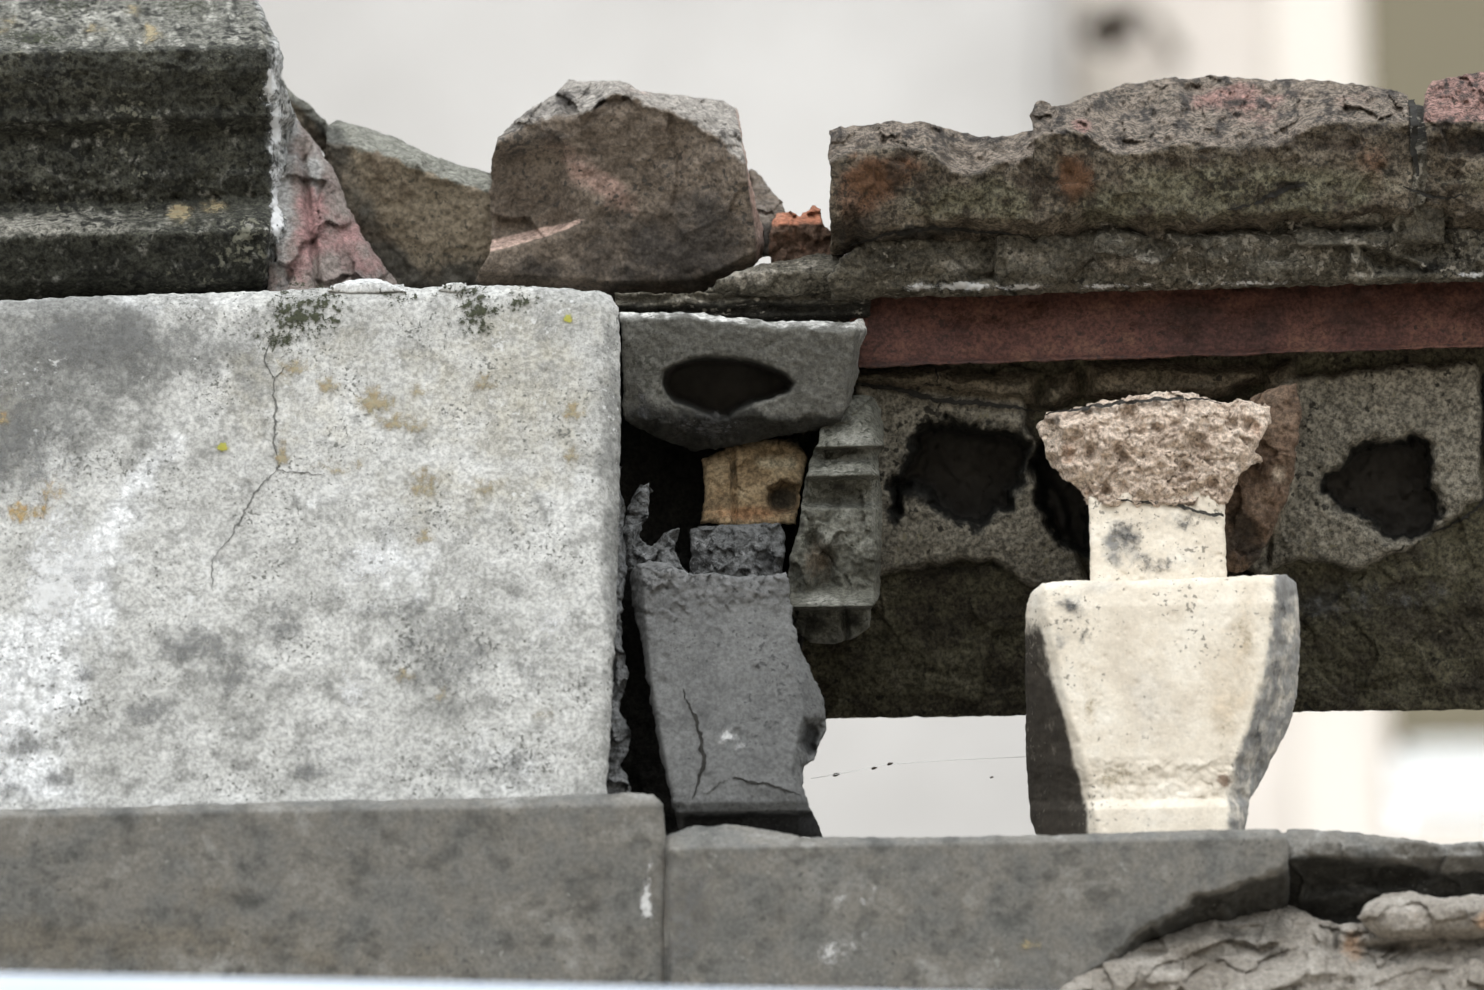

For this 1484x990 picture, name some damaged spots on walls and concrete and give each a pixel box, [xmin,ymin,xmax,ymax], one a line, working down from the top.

crack [210,345,323,589]
crack [1116,499,1224,517]
crack [683,689,800,799]